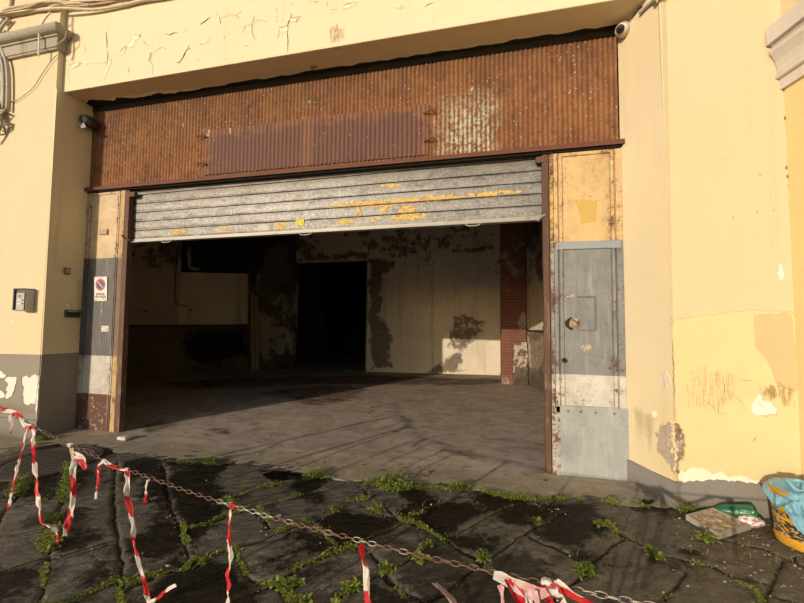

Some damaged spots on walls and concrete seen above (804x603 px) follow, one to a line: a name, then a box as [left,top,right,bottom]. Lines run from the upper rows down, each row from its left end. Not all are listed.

peeling [0,369,40,417]
peeling [749,393,778,417]
spalling [652,411,765,484]